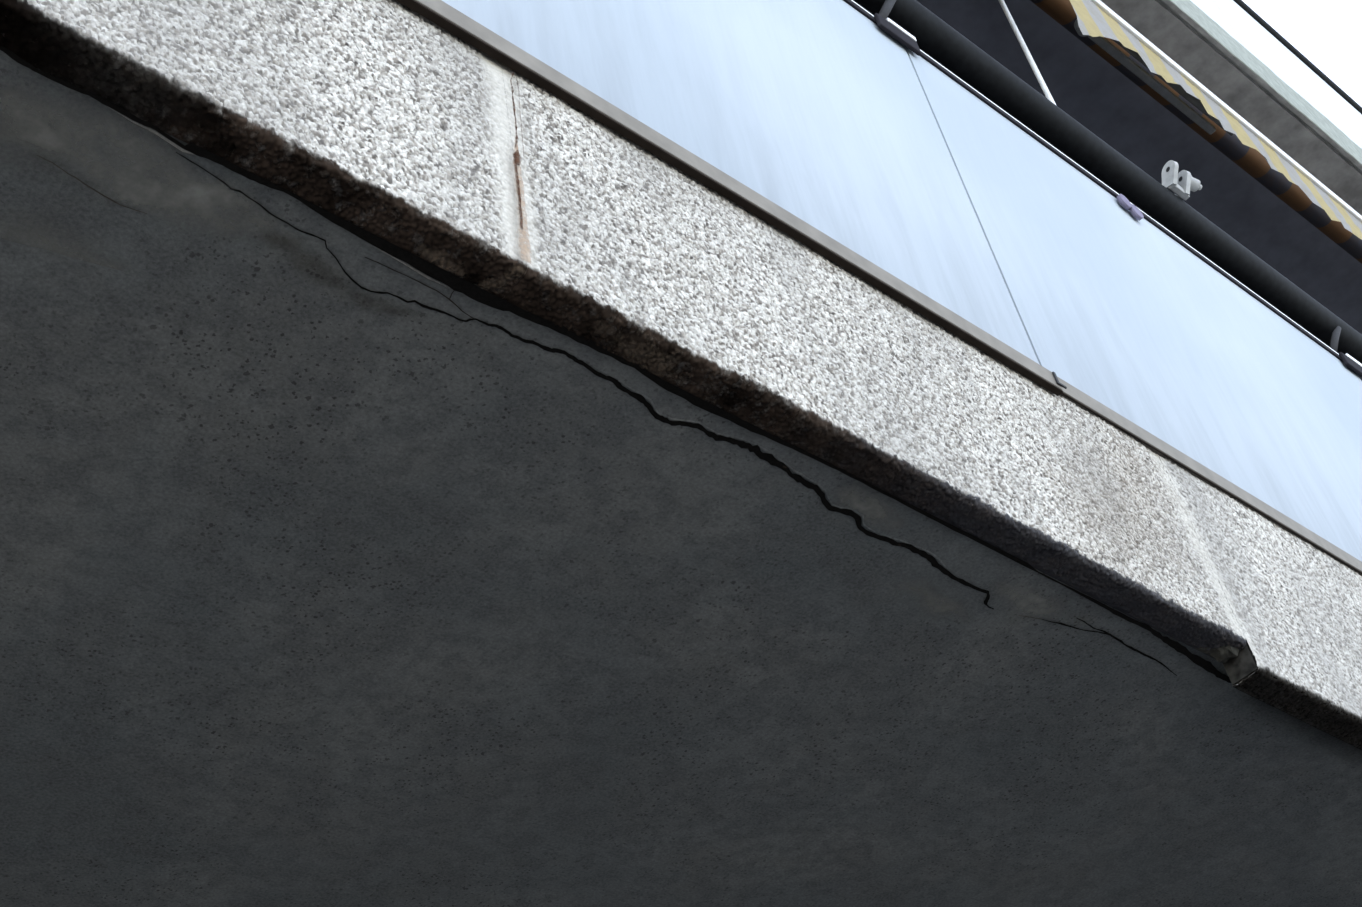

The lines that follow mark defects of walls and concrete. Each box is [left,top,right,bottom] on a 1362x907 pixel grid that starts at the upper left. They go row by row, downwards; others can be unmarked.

crack [0,46,1231,683]